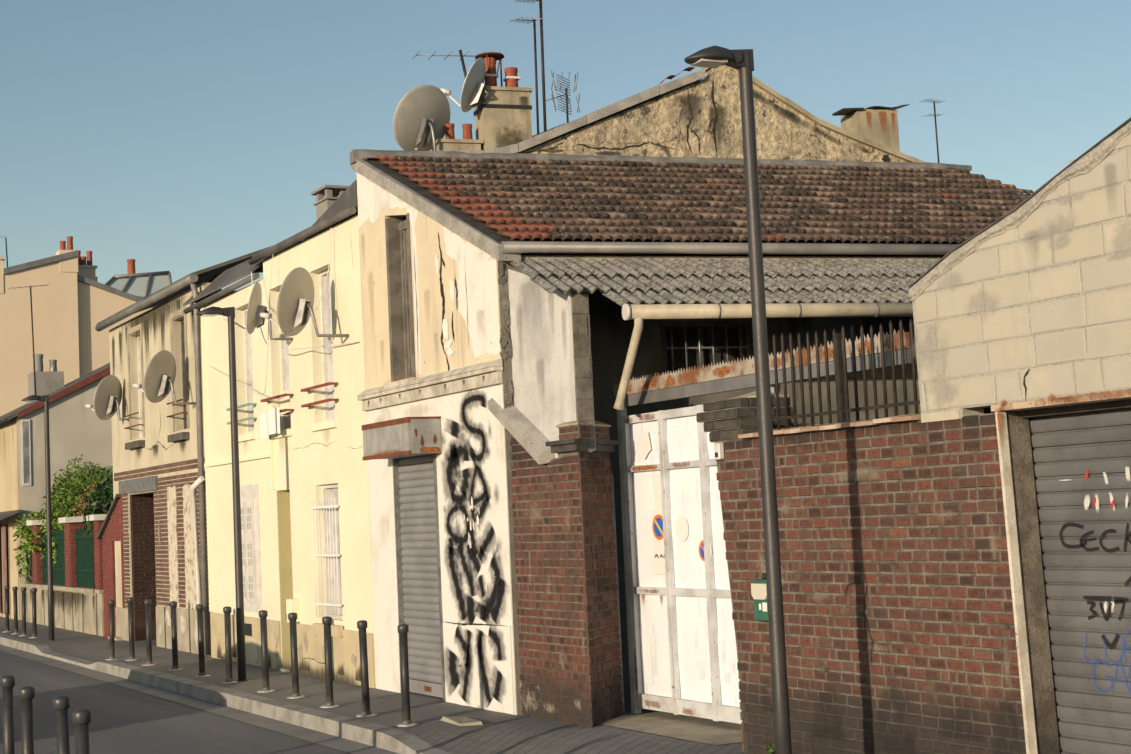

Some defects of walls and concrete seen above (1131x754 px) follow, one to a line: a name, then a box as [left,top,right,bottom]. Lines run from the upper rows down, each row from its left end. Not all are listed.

crack [525,83,720,156]
damp [679,94,724,136]
damp [753,92,840,143]
peeling [356,173,421,375]
crack [414,234,469,371]
peeling [435,227,513,360]
spalling [504,380,514,408]
corrosion [644,375,675,389]
corrosion [713,366,730,377]
spalling [505,429,513,469]